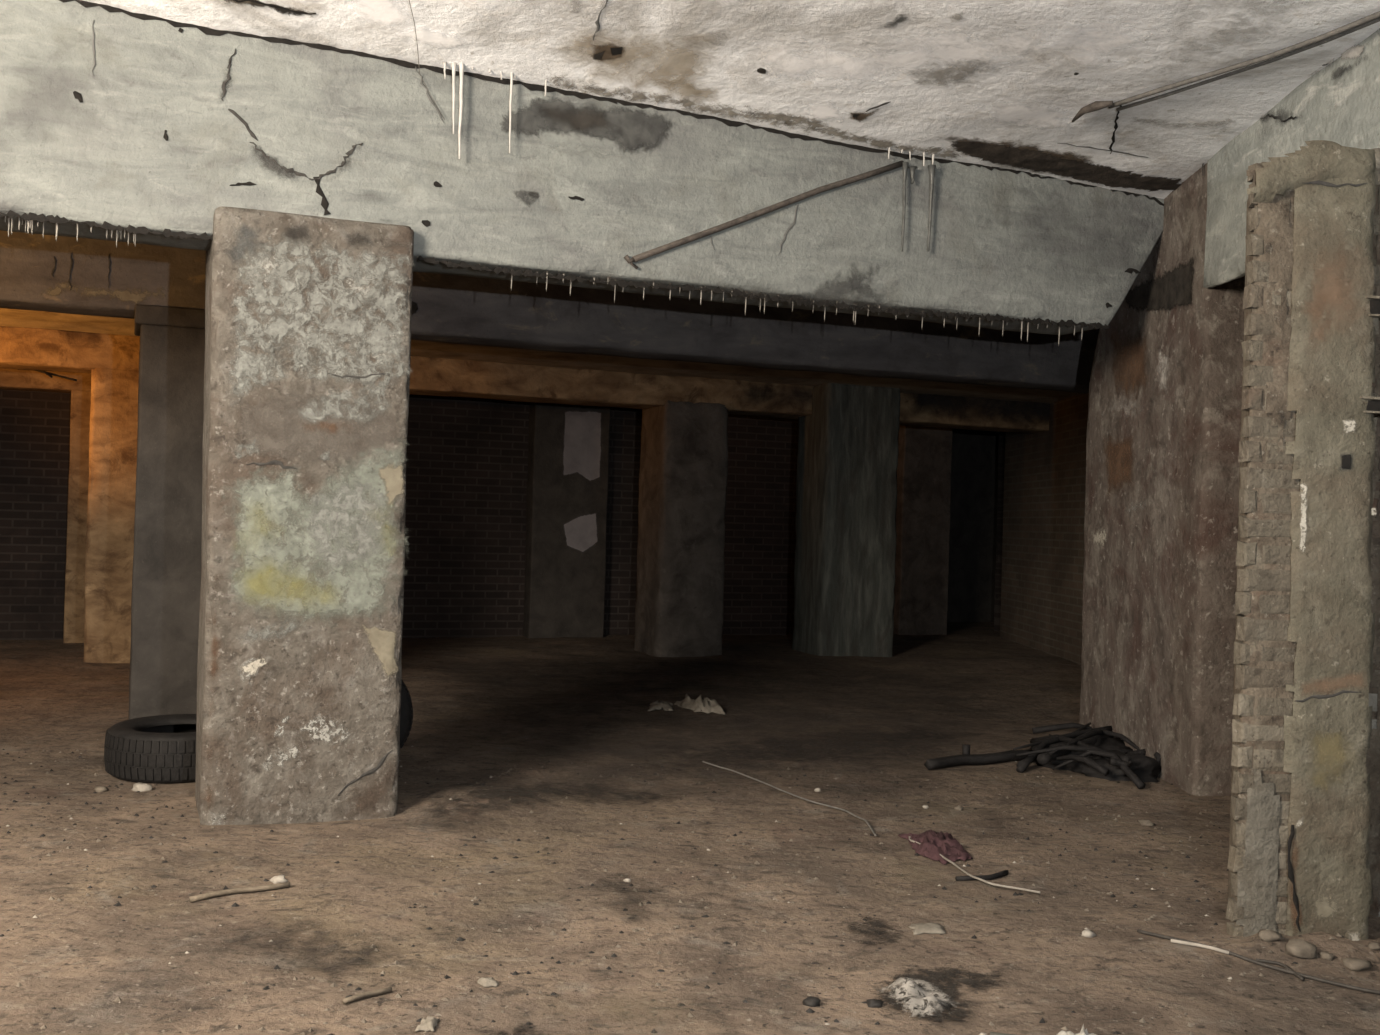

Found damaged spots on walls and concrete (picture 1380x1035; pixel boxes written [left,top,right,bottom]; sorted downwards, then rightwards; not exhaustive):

water stain [569,35,713,98]
crack [221,48,363,215]
water stain [502,98,672,155]
crack [1287,825,1301,932]